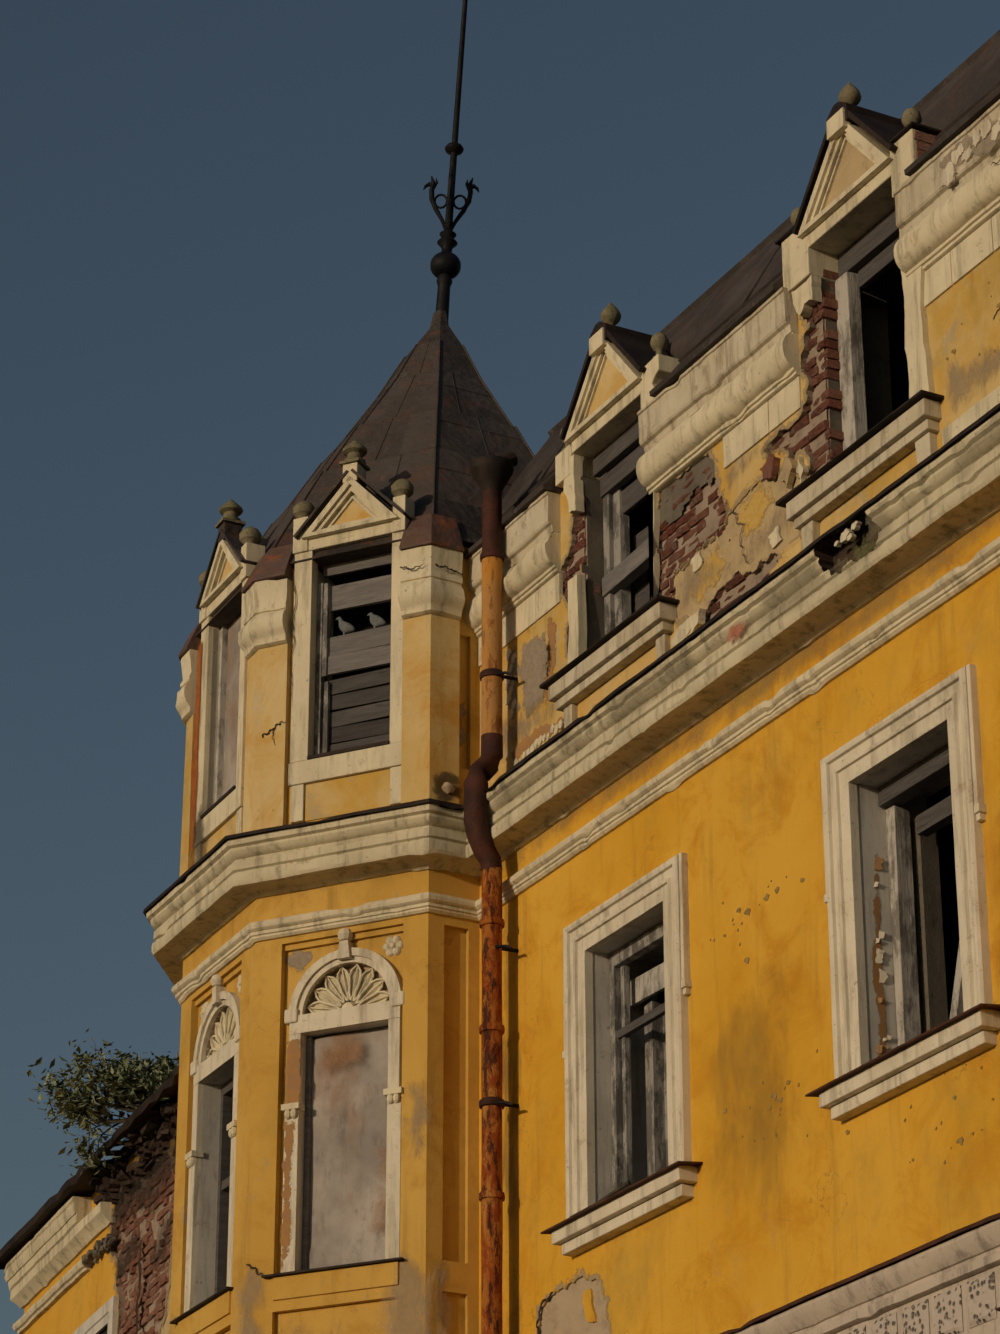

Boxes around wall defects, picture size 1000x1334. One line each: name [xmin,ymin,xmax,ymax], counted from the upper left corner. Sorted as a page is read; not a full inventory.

flaking render [914,130,936,159]
peeling [939,118,1000,188]
flaking render [656,269,844,649]
flaking render [834,520,862,548]
crack [262,577,296,746]
flaking render [505,504,601,766]
peeling [872,855,892,1056]
flaking render [108,1120,176,1334]
flaking render [535,1268,611,1334]